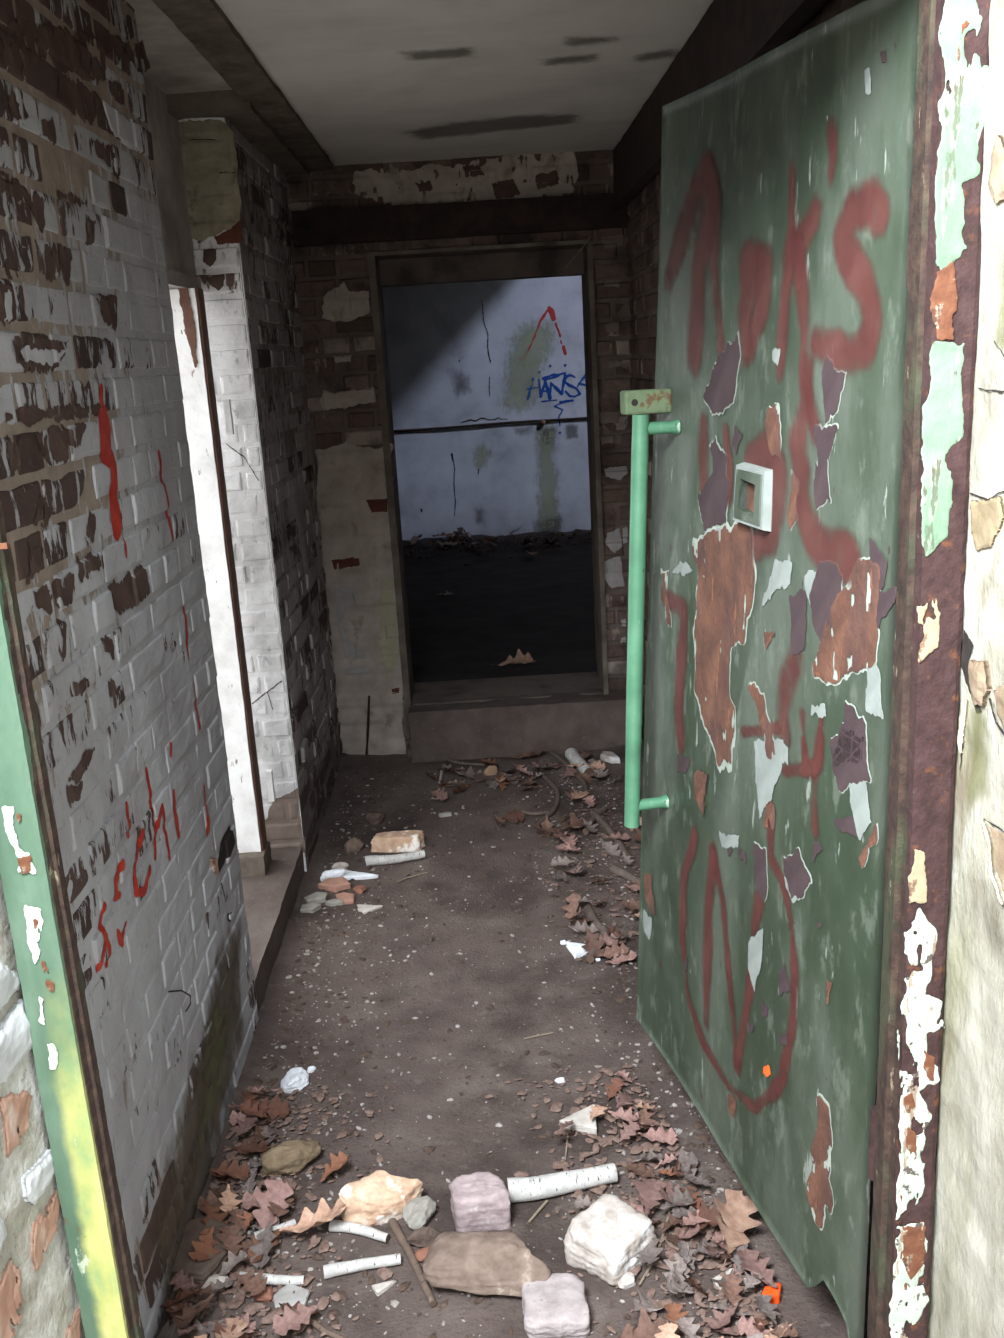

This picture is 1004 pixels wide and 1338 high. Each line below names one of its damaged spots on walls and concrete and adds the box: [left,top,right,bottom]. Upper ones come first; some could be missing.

peeling [0,258,67,375]
rust [930,260,958,341]
crack [970,491,1004,500]
peeling [26,510,150,662]
peeling [692,426,757,773]
peeling [789,538,897,686]
peeling [829,700,872,794]
flaking render [957,630,1004,753]
peeling [2,806,36,874]
peeling [24,905,43,964]
flaking render [0,960,58,1158]
flaking render [0,1149,61,1338]